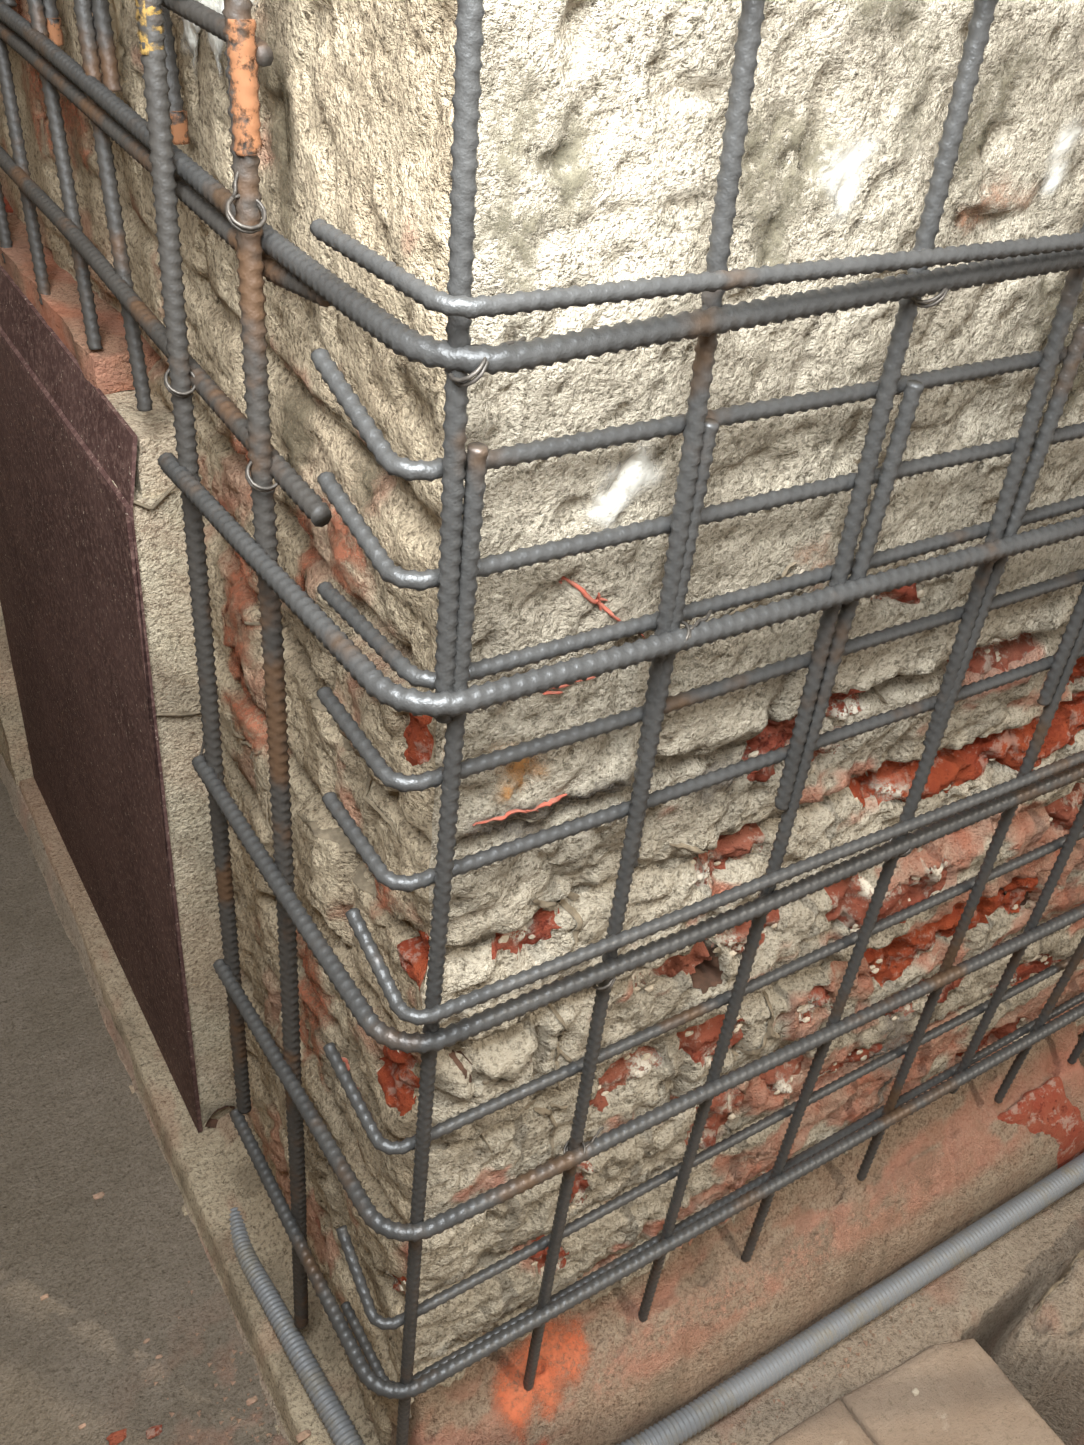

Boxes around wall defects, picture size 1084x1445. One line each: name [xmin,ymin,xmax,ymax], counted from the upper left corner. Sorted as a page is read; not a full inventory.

spalling [157,322,1084,1445]